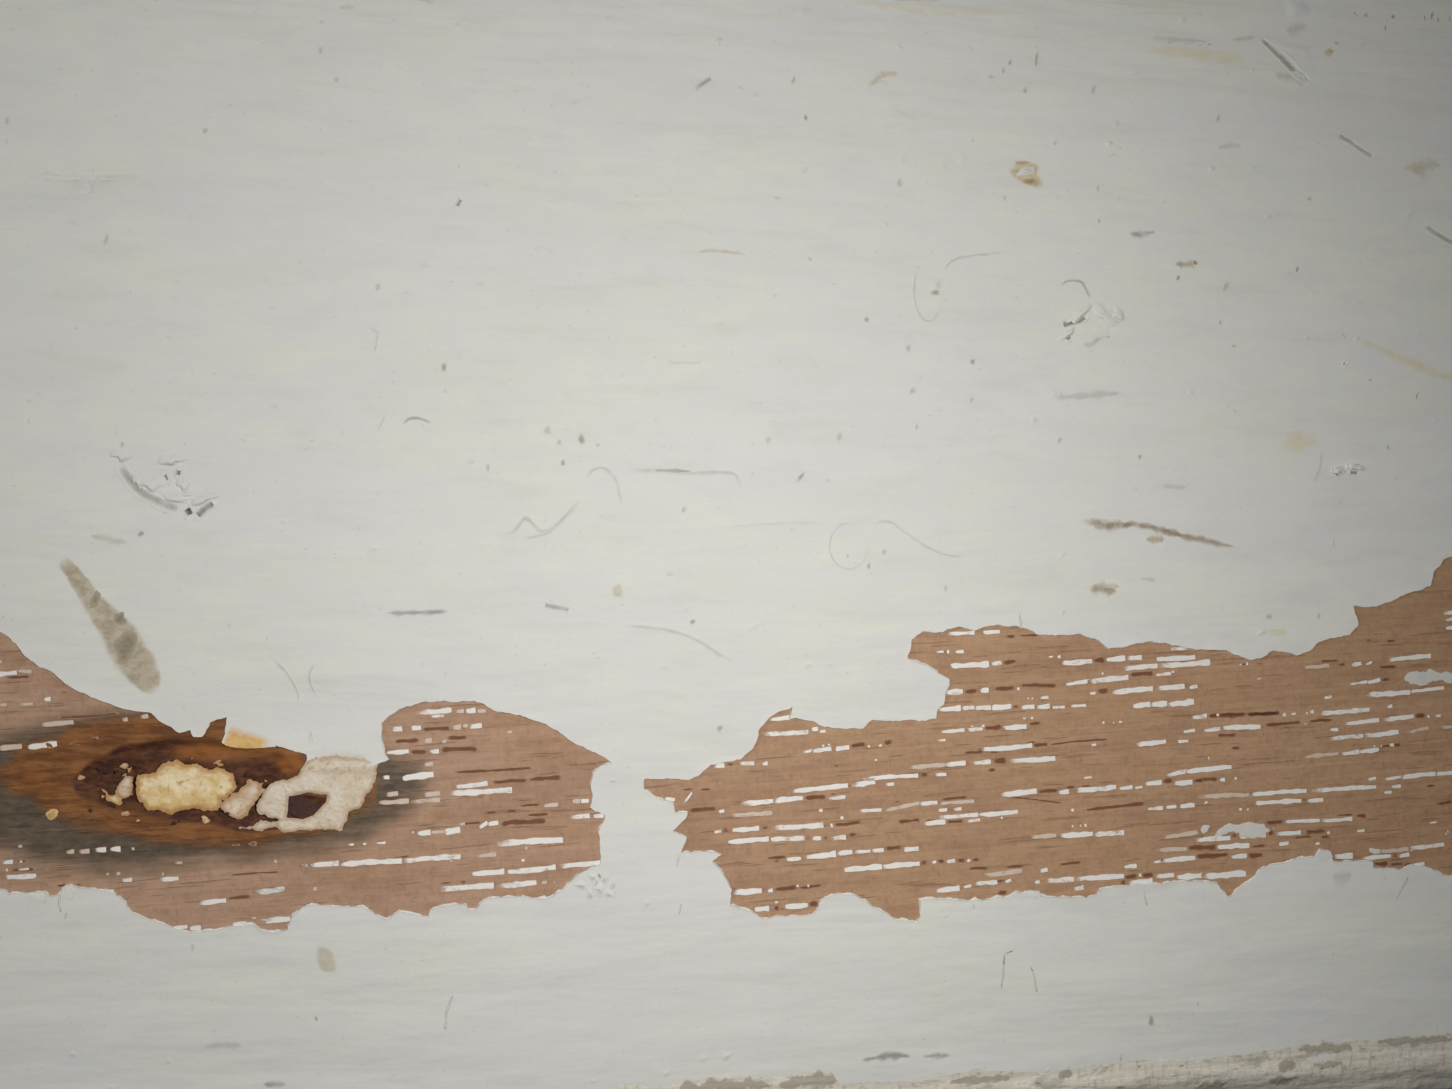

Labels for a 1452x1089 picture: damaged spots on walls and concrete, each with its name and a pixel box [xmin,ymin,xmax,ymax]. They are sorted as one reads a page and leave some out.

peeling [0,632,149,751]
peeling [0,701,616,938]
peeling [644,557,1452,921]